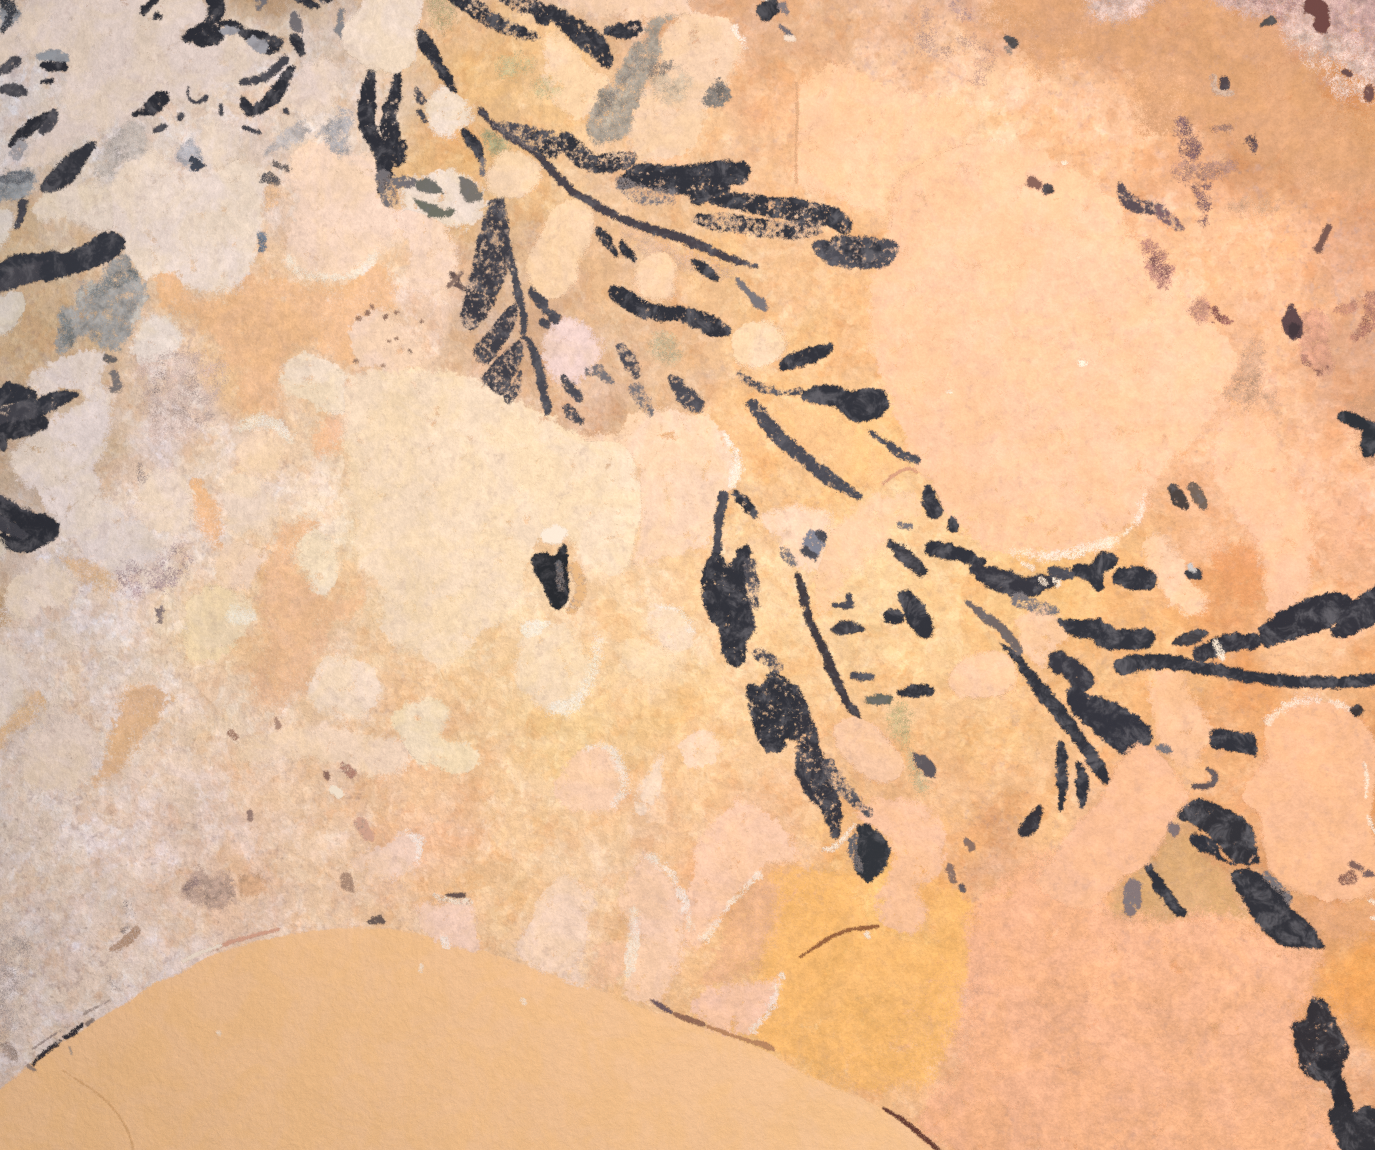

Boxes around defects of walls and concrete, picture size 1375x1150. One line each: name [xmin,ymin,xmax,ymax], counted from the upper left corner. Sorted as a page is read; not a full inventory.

peeling [530,524,587,614]
crack [799,924,879,958]